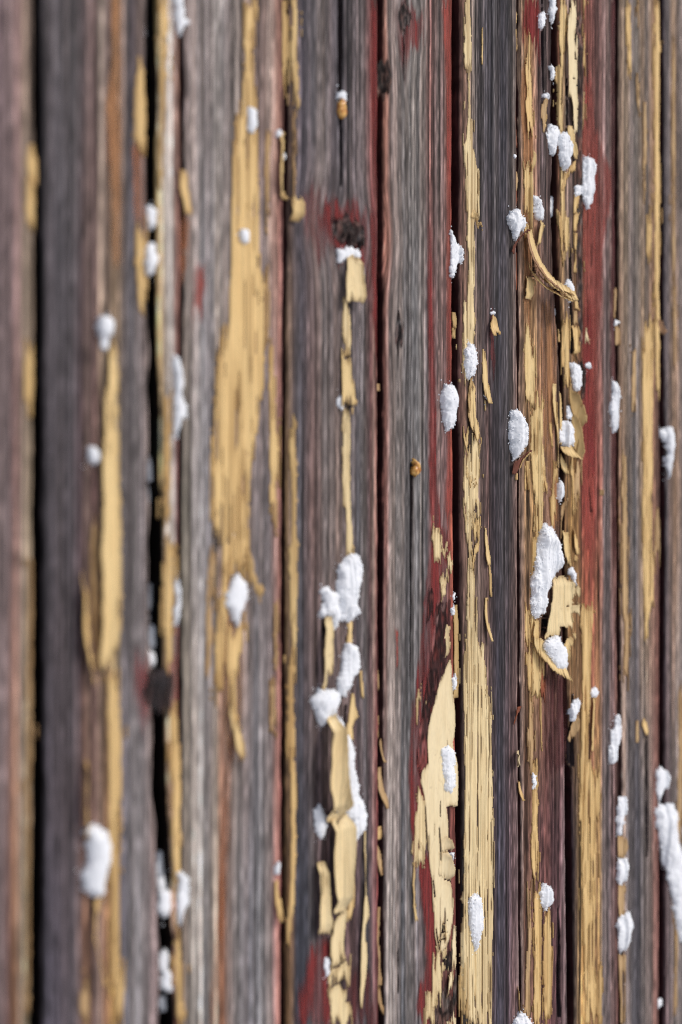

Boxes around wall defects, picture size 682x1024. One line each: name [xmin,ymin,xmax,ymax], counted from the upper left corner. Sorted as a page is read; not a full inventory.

peeling [511,0,588,300]
peeling [205,0,305,948]
peeling [321,617,353,691]
peeling [317,671,384,1024]
peeling [341,254,367,556]
peeling [377,716,389,809]
peeling [411,0,495,1024]
peeling [512,301,604,1024]
peeling [618,884,626,917]
peeling [618,954,626,1024]
peeling [618,835,628,858]
peeling [635,718,649,743]